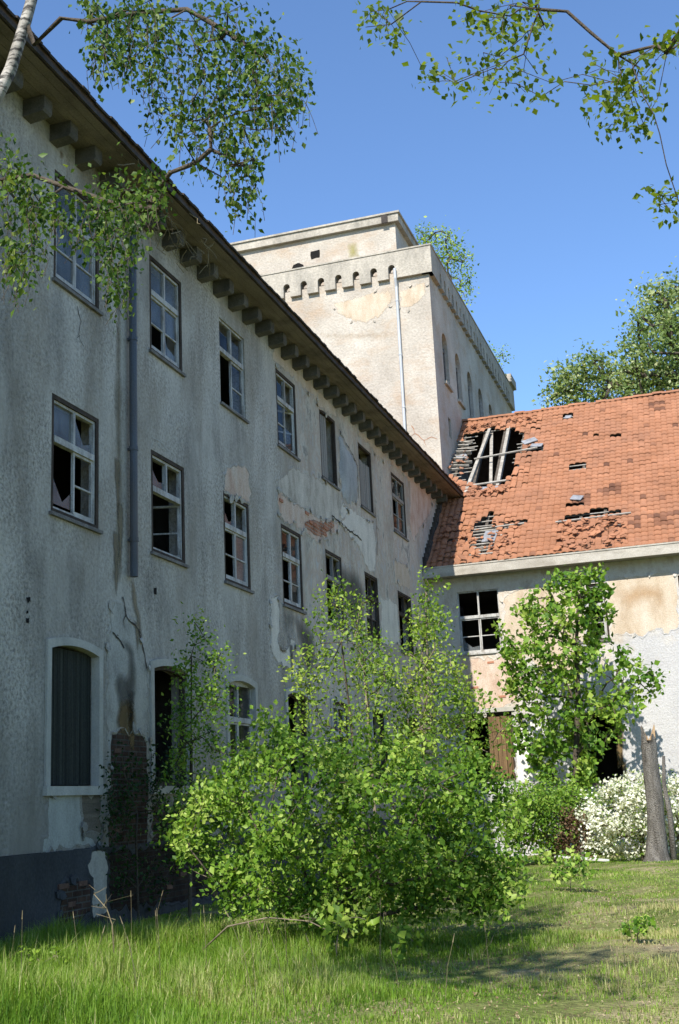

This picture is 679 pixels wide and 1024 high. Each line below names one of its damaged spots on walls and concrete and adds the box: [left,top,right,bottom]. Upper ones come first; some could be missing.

flaking render [223,463,253,505]
flaking render [274,465,376,575]
crack [332,431,378,547]
crack [113,597,148,668]
flaking render [269,593,299,684]
flaking render [456,584,587,718]
flaking render [601,571,679,639]
flaking render [56,600,231,925]